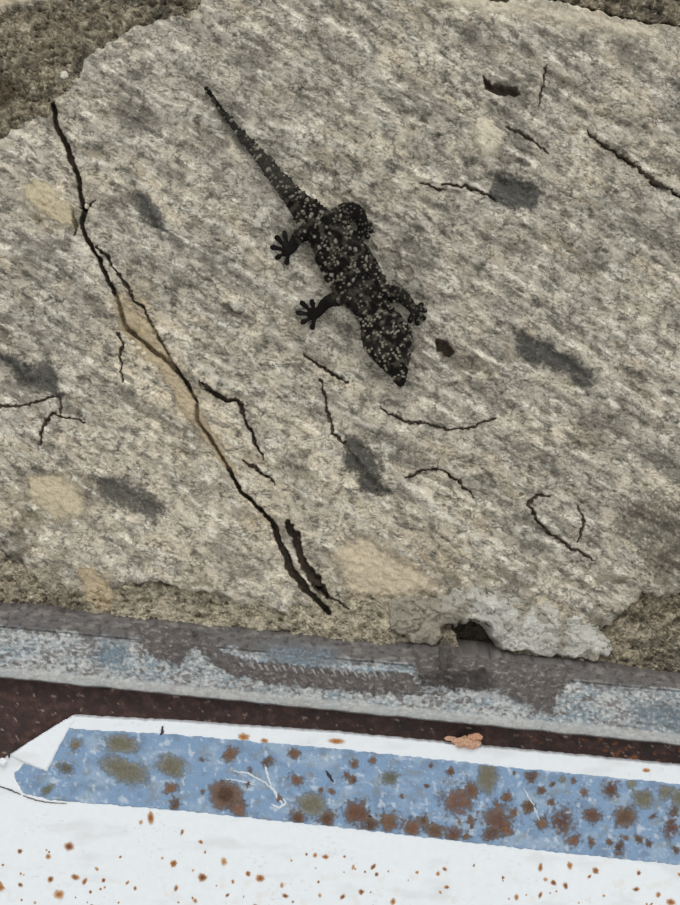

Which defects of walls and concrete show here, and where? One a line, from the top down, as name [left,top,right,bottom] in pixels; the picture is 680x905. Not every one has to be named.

crack [51,101,350,615]
corrosion [55,761,75,774]
corrosion [98,734,185,810]
corrosion [201,767,252,817]
corrosion [222,733,249,763]
corrosion [344,757,376,784]
corrosion [289,765,603,849]
corrosion [444,733,483,750]
corrosion [602,780,680,856]